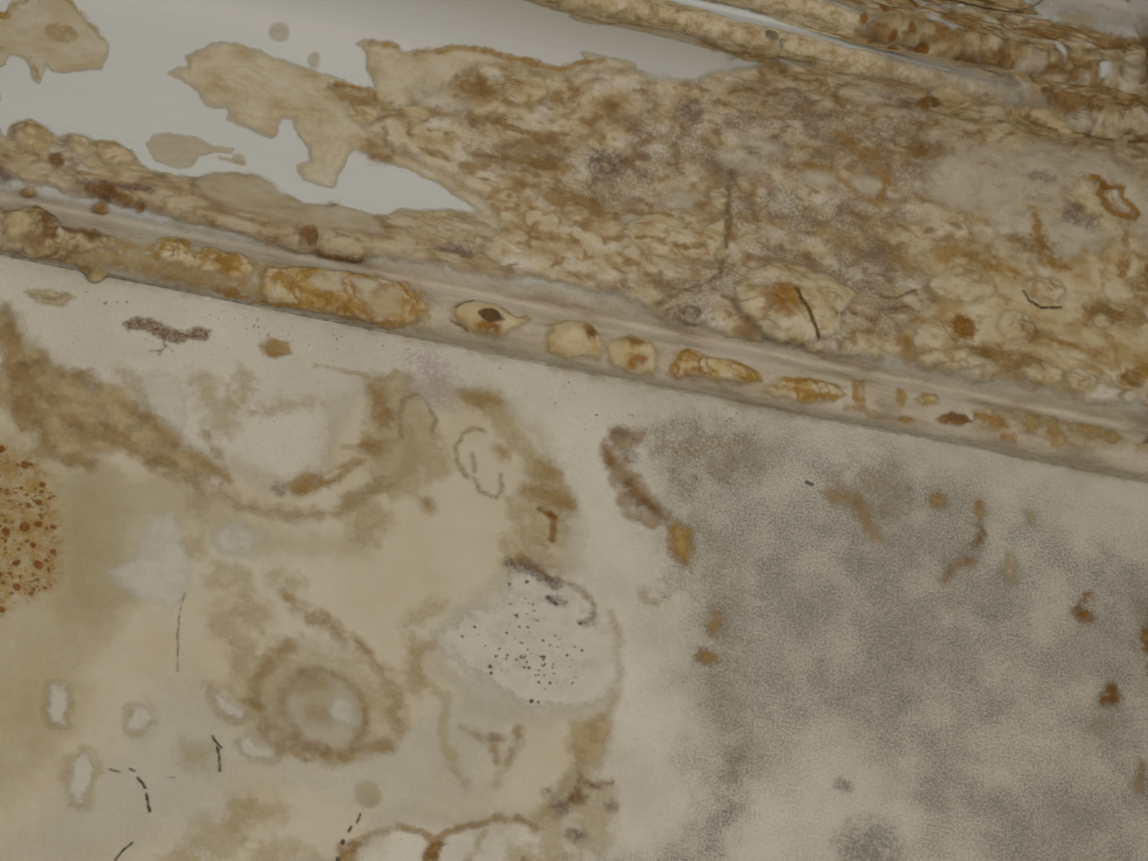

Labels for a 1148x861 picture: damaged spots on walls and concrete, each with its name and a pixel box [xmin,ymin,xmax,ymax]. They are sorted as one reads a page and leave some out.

peeling [0,0,1148,481]
rust [0,445,56,612]
damp [0,312,612,861]
damp [603,424,757,565]
rust [1101,683,1118,704]